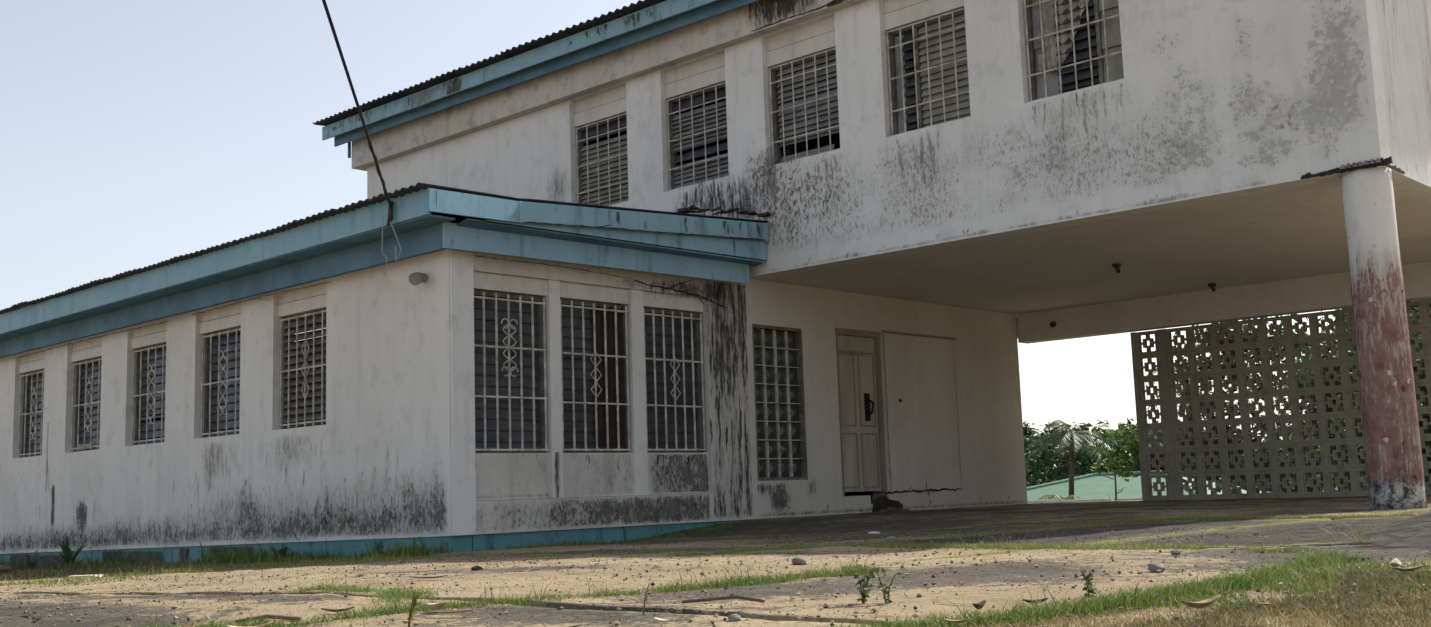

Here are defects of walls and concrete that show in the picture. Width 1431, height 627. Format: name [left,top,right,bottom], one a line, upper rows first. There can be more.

damp [676,146,864,259]
damp [877,84,1191,237]
damp [495,279,873,529]
damp [0,471,446,550]